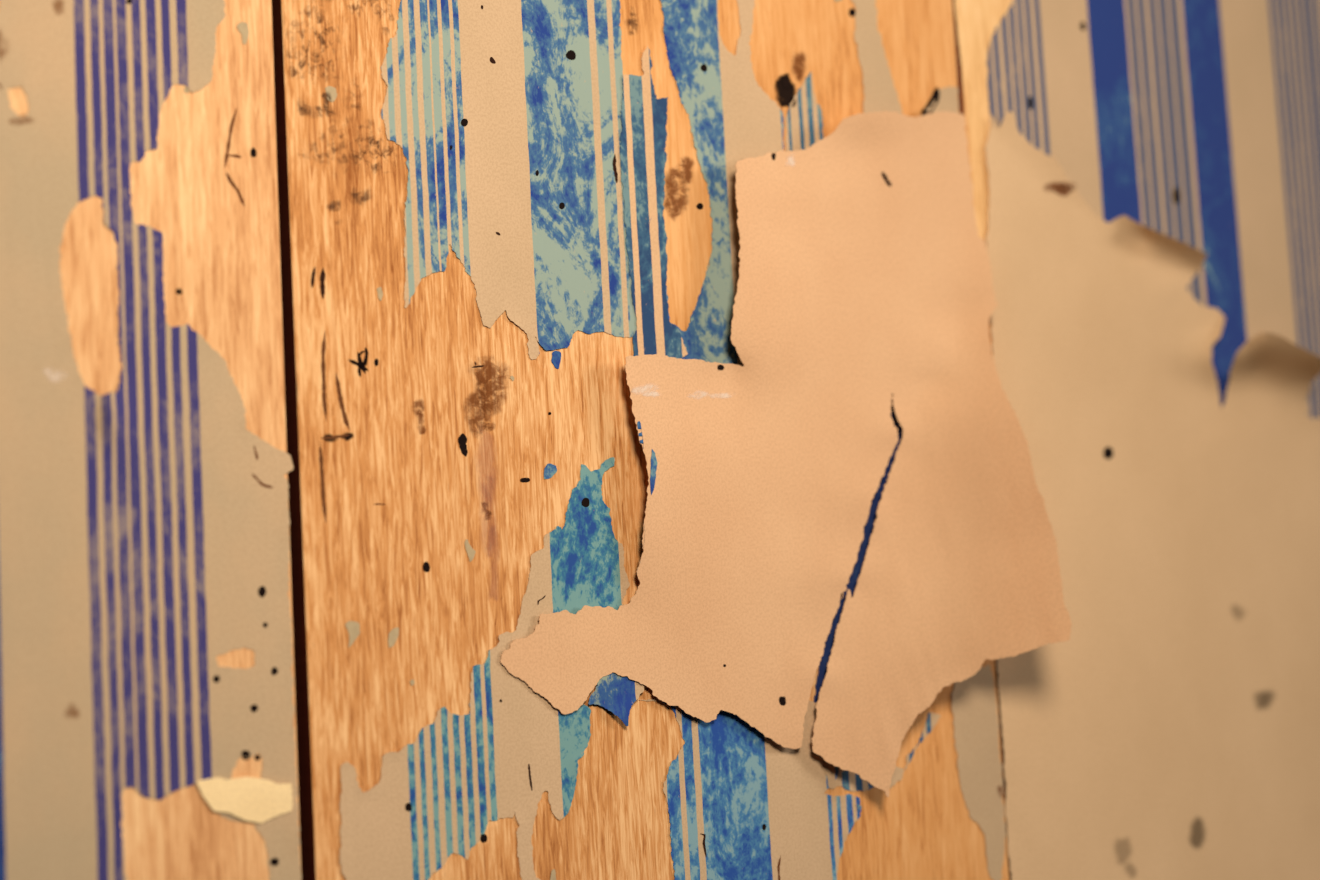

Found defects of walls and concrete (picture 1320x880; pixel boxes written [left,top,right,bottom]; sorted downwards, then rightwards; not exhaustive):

peeling [59,196,123,396]
peeling [121,0,1072,880]